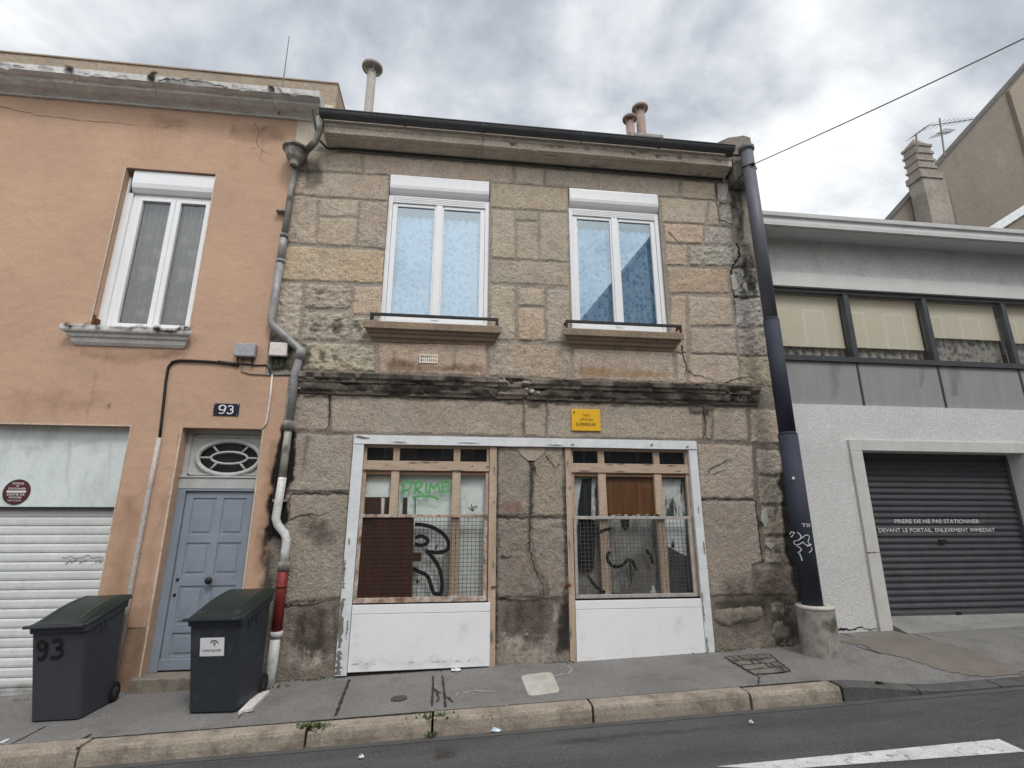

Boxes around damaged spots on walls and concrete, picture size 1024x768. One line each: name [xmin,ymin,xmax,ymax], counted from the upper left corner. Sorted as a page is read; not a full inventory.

crack [715,183,755,315]
water stain [732,190,756,291]
crack [681,345,764,383]
water stain [262,425,296,588]
crack [497,450,564,602]
peeling [281,562,375,674]